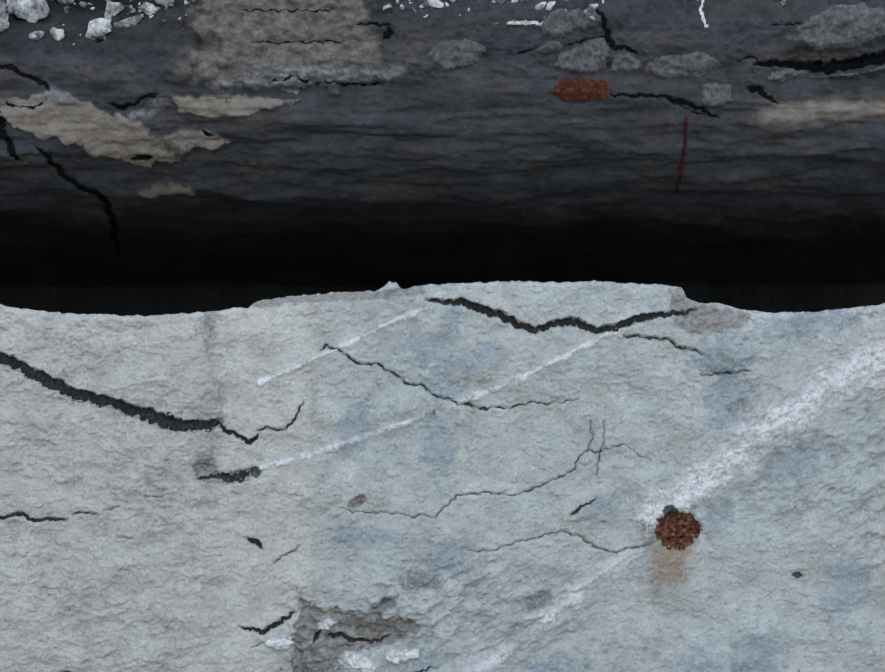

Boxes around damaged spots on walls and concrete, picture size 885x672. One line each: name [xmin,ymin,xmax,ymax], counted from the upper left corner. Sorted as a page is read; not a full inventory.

spalling [172,0,416,118]
peeling [427,38,485,70]
corrosion [548,76,612,103]
crack [734,51,885,104]
crack [0,63,121,258]
peeling [0,92,230,168]
crack [426,298,701,354]
crack [0,352,304,445]
crack [320,344,574,411]
crack [197,471,250,483]
crack [0,506,120,522]
corrosion [653,512,701,586]